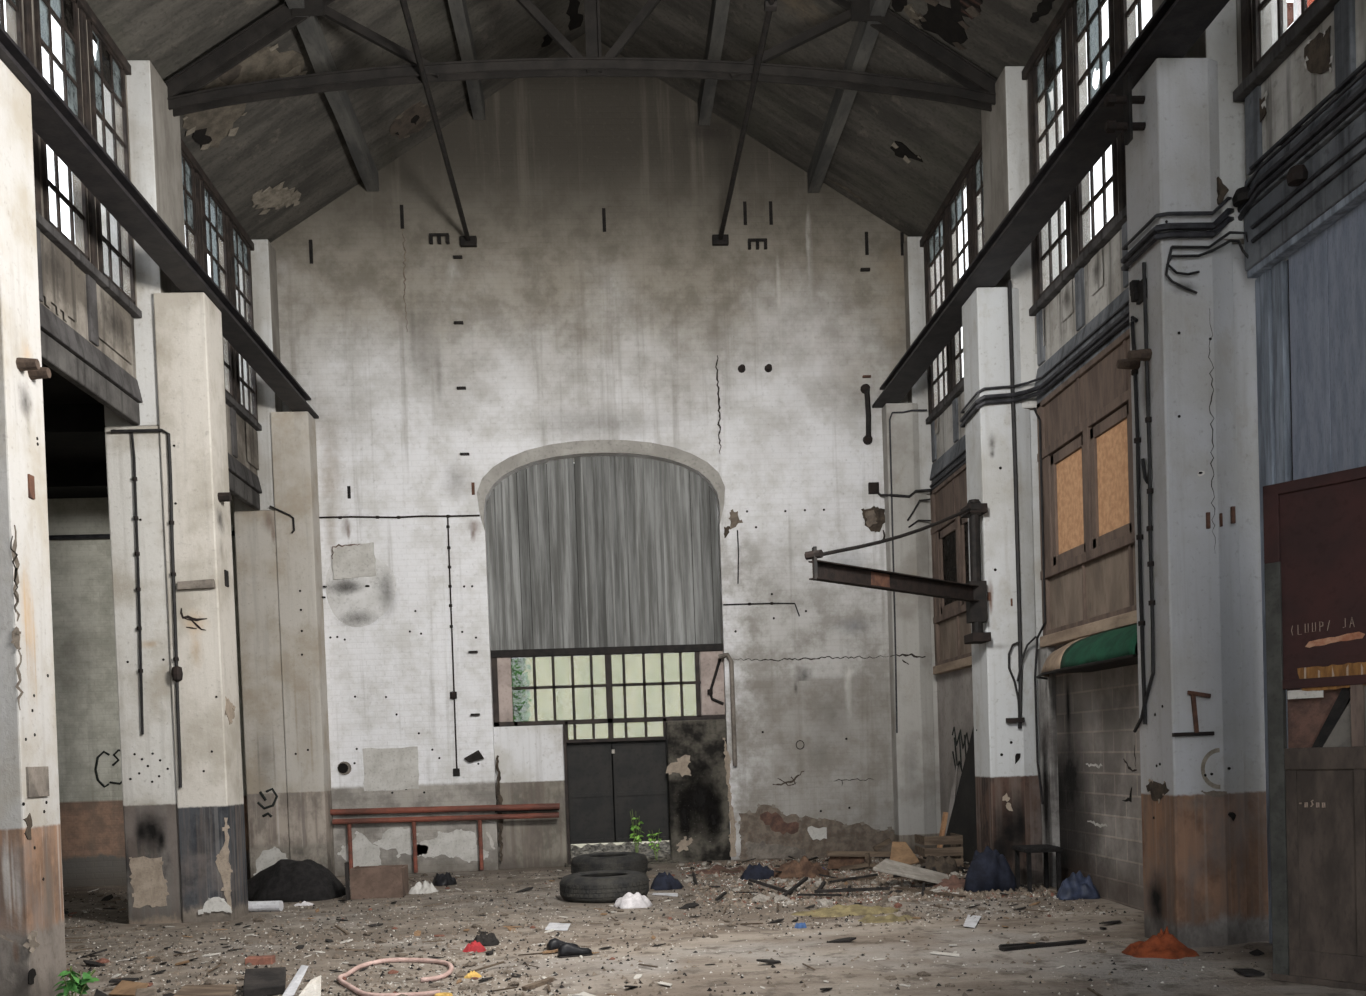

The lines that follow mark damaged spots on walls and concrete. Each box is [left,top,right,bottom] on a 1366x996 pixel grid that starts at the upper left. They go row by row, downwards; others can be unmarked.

peeling [1304,26,1333,74]
flaking render [251,181,301,215]
crack [714,355,722,453]
crack [1208,308,1216,549]
damp [679,774,720,836]
spalling [723,738,895,860]
peeling [129,856,169,908]
peeling [198,818,233,915]